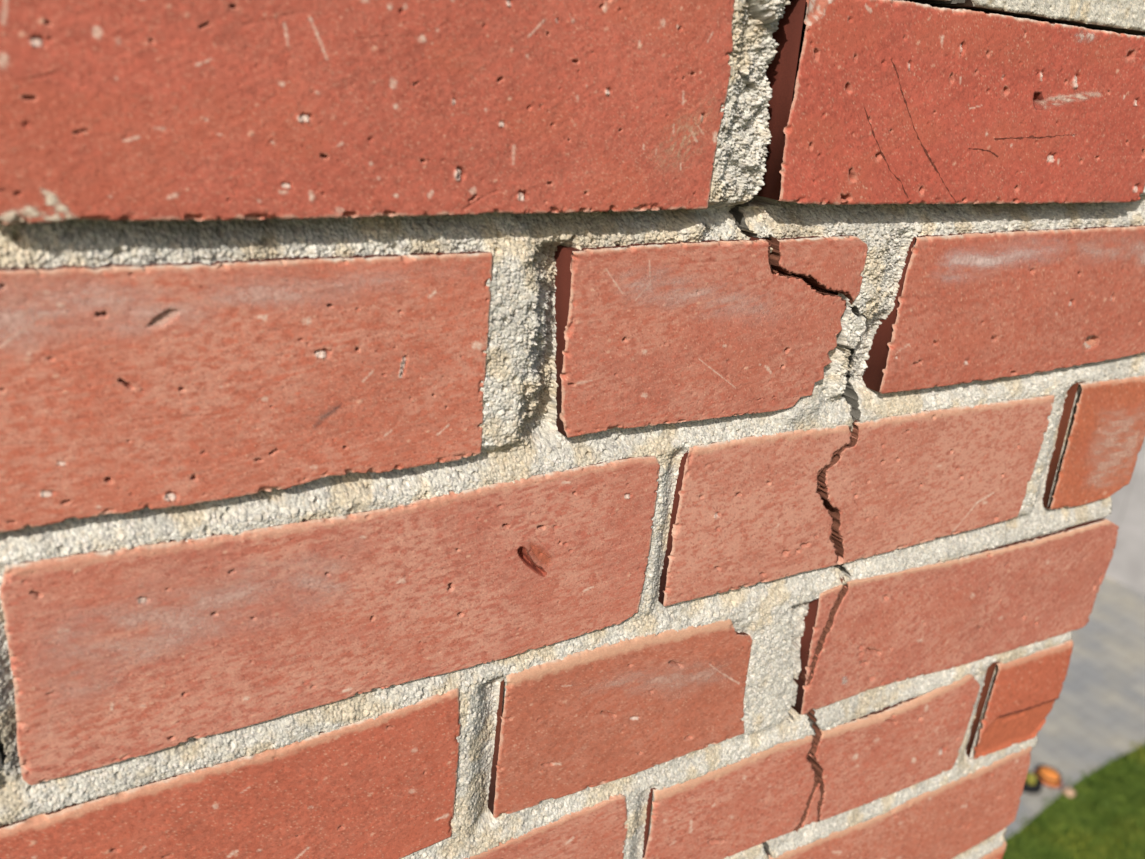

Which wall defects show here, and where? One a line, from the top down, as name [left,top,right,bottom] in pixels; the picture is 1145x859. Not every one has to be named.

crack [729,198,867,321]
crack [787,344,861,832]
crack [762,842,772,858]